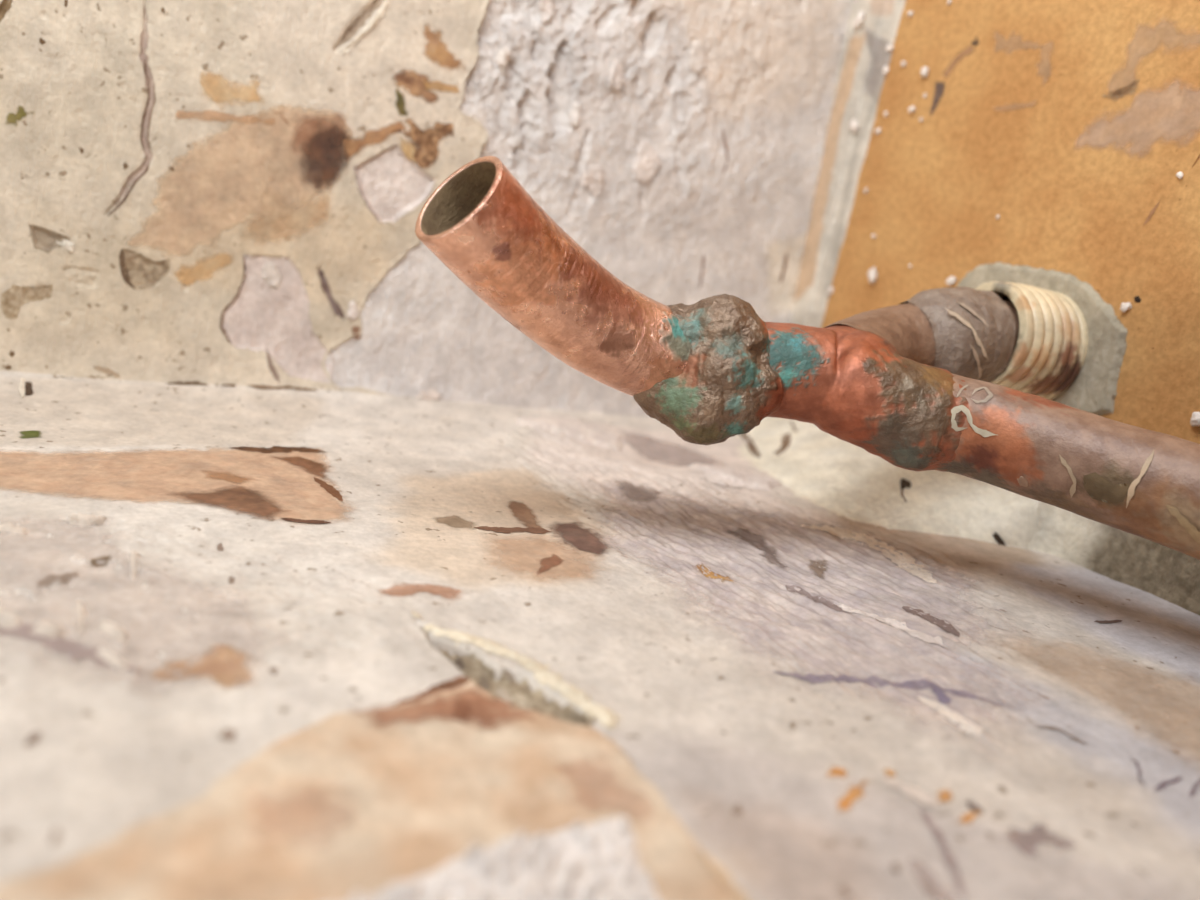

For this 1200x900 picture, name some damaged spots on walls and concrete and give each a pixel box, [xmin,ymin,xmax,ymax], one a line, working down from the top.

crack [106,4,156,218]
flaking render [460,0,853,323]
flaking render [220,242,648,416]
flaking render [392,611,622,730]